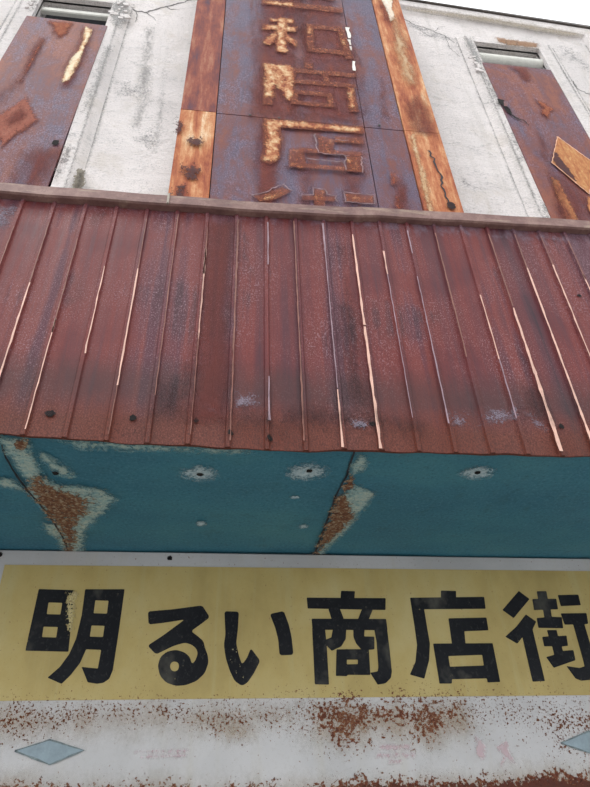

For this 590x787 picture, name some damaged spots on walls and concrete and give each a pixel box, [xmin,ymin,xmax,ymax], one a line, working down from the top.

rust [47,21,73,37]
crack [132,0,189,22]
rust [62,26,92,85]
rust [551,177,590,220]